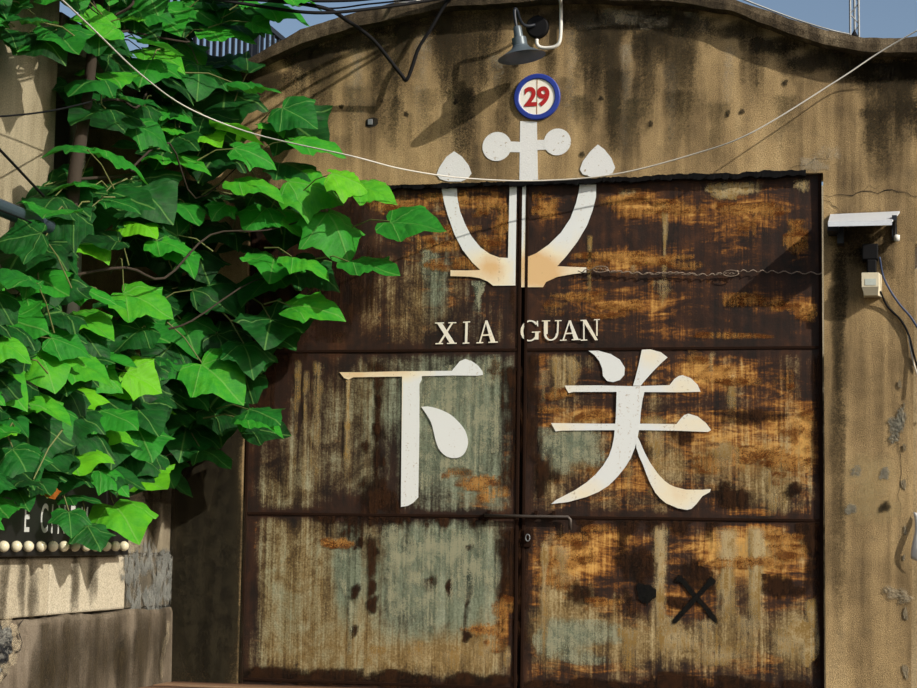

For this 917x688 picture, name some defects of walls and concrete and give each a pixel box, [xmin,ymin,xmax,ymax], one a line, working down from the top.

water stain [243,5,917,165]
crack [824,186,916,209]
spalling [0,623,14,673]
water stain [19,557,38,620]
water stain [29,429,247,688]
corrosion [250,231,378,408]
corrosion [314,363,414,614]
corrosion [460,520,693,653]
corrosion [664,521,825,625]
corrosion [670,353,825,499]
water stain [832,226,891,549]
spalling [888,403,906,451]